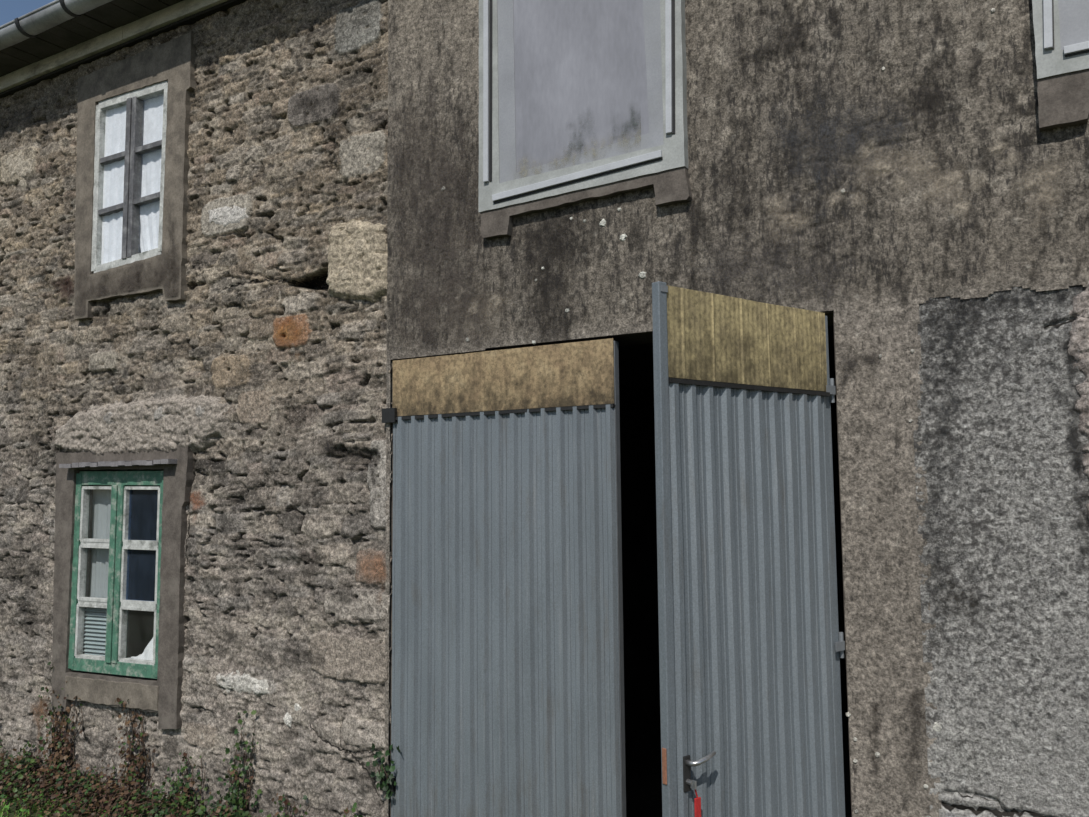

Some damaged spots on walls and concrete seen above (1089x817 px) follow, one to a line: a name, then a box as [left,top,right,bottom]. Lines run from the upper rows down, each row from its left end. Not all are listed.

spalling [1067,281,1089,485]
crack [942,790,1045,817]